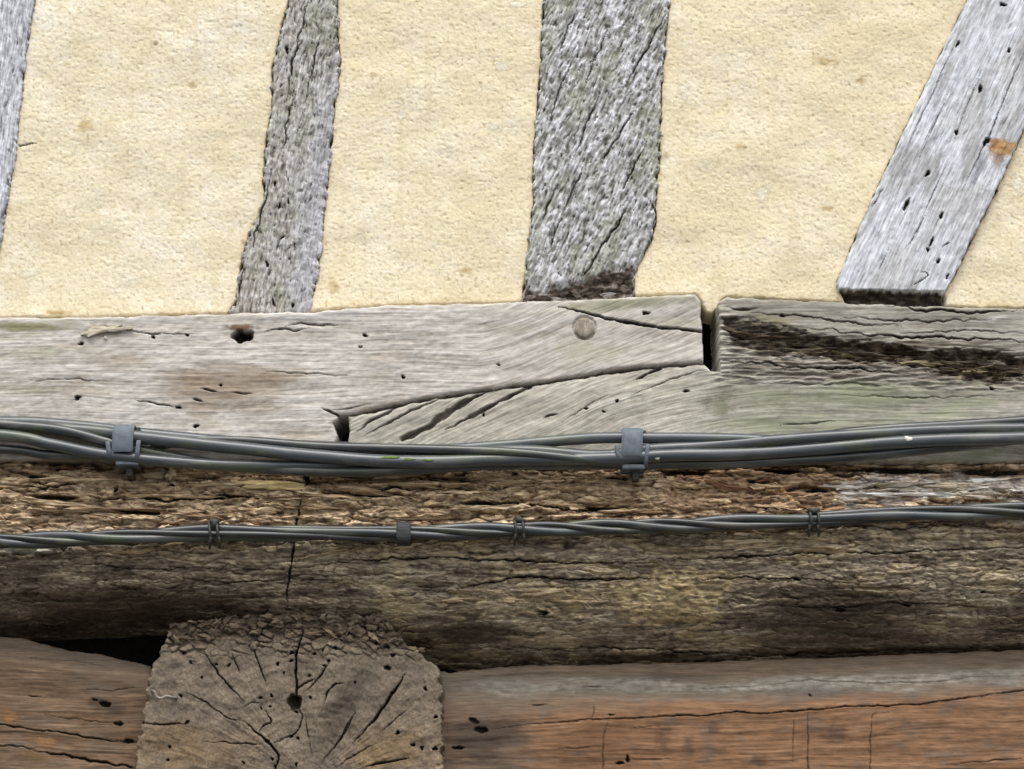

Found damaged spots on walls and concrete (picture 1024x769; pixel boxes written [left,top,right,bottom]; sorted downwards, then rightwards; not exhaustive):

crack [569,309,701,333]
crack [792,281,1017,341]
crack [323,393,519,439]
crack [39,476,1021,608]
crack [199,637,409,769]